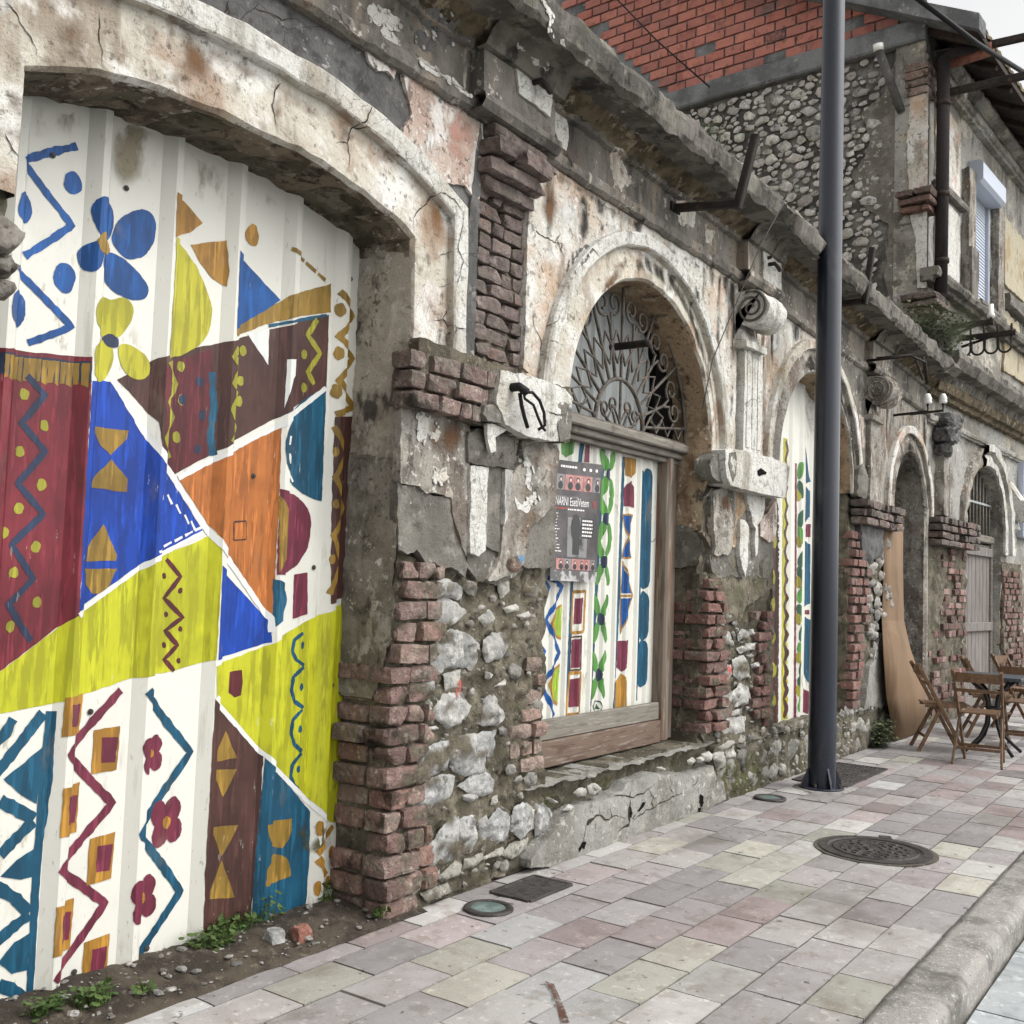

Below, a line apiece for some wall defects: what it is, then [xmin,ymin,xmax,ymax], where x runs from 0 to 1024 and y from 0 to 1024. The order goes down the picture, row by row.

flaking render [367,3,403,46]
crack [337,108,372,164]
flaking render [416,411,442,445]
spalling [480,404,504,424]
flaking render [432,467,449,486]
flaking render [515,455,541,513]
spalling [672,571,775,745]
spalling [837,517,894,711]
spalling [927,545,968,723]
crack [583,777,699,842]